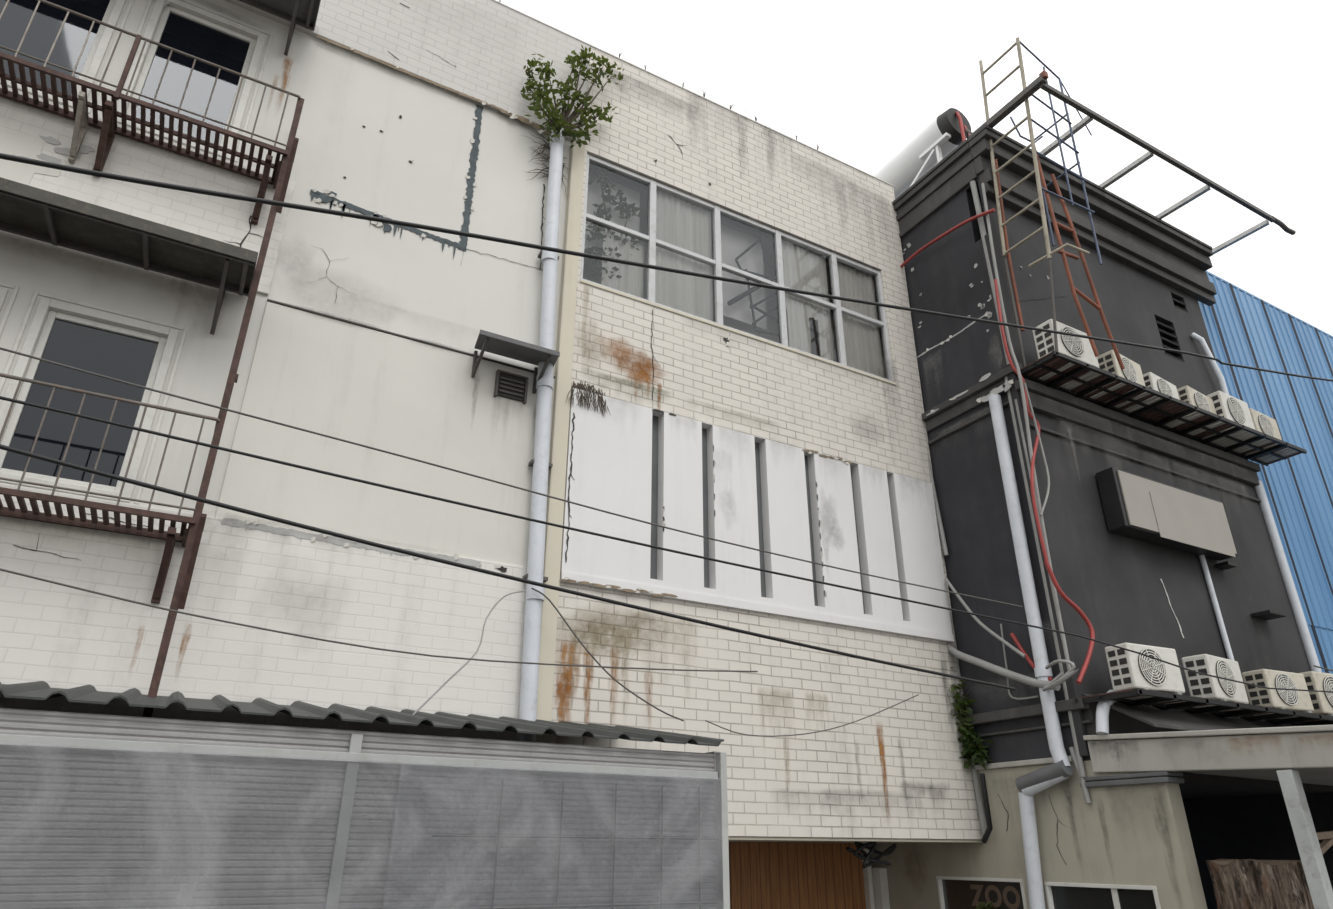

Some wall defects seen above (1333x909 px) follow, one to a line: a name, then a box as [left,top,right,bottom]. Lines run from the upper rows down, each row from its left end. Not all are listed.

peeling [310,35,551,259]
corrosion [613,344,661,401]
corrosion [557,644,590,718]